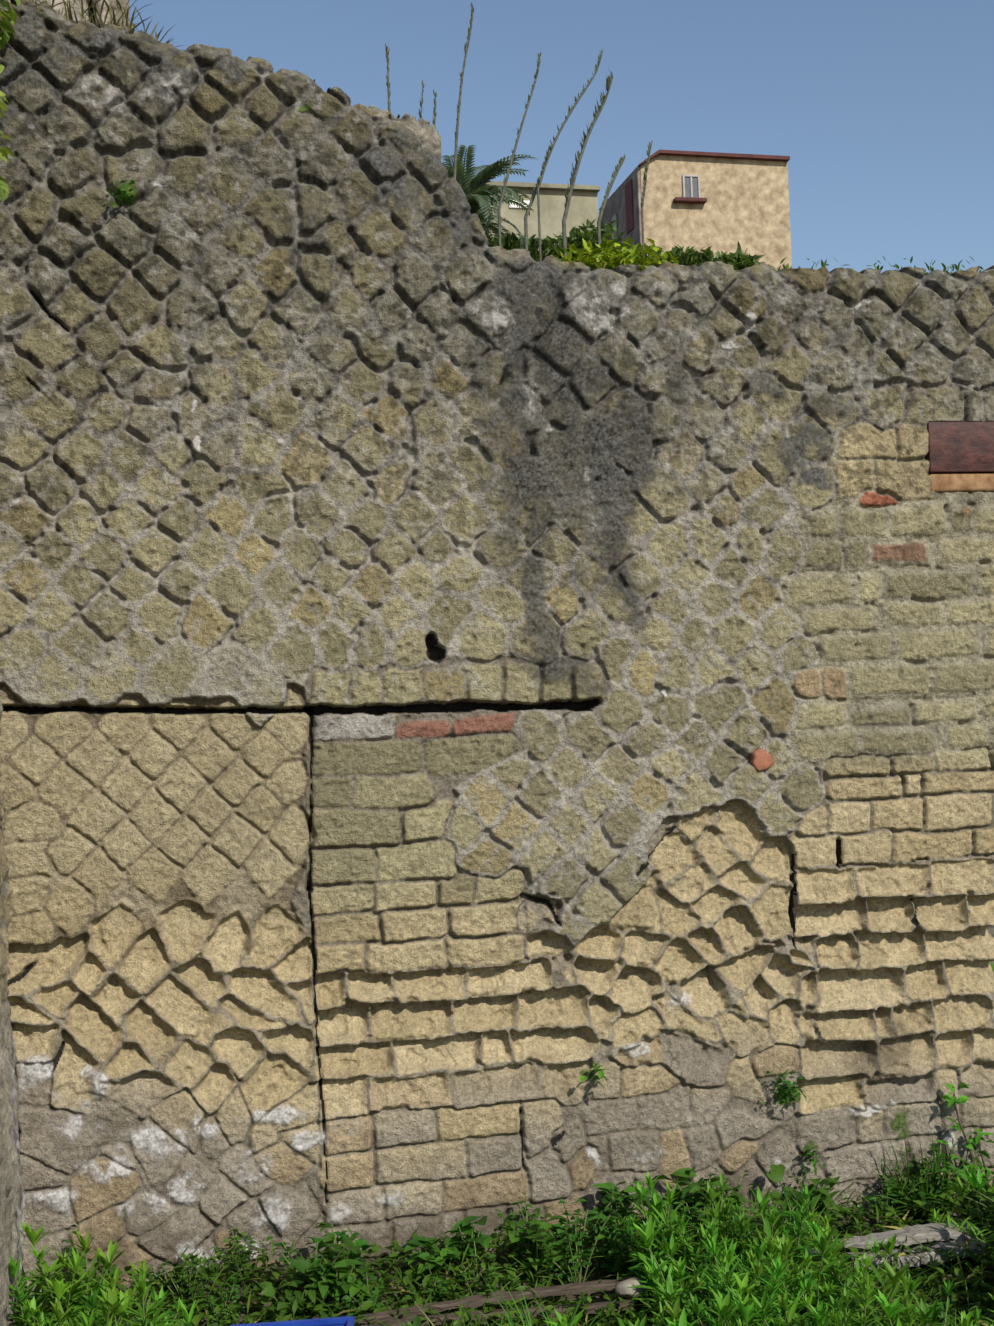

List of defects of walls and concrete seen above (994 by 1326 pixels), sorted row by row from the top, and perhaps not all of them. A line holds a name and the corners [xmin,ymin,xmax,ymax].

leakage [354,126,479,255]
leakage [480,258,655,692]
crack [637,826,677,876]
crack [835,839,843,868]
crack [2,699,600,1204]
crack [788,854,797,949]
crack [910,899,920,926]